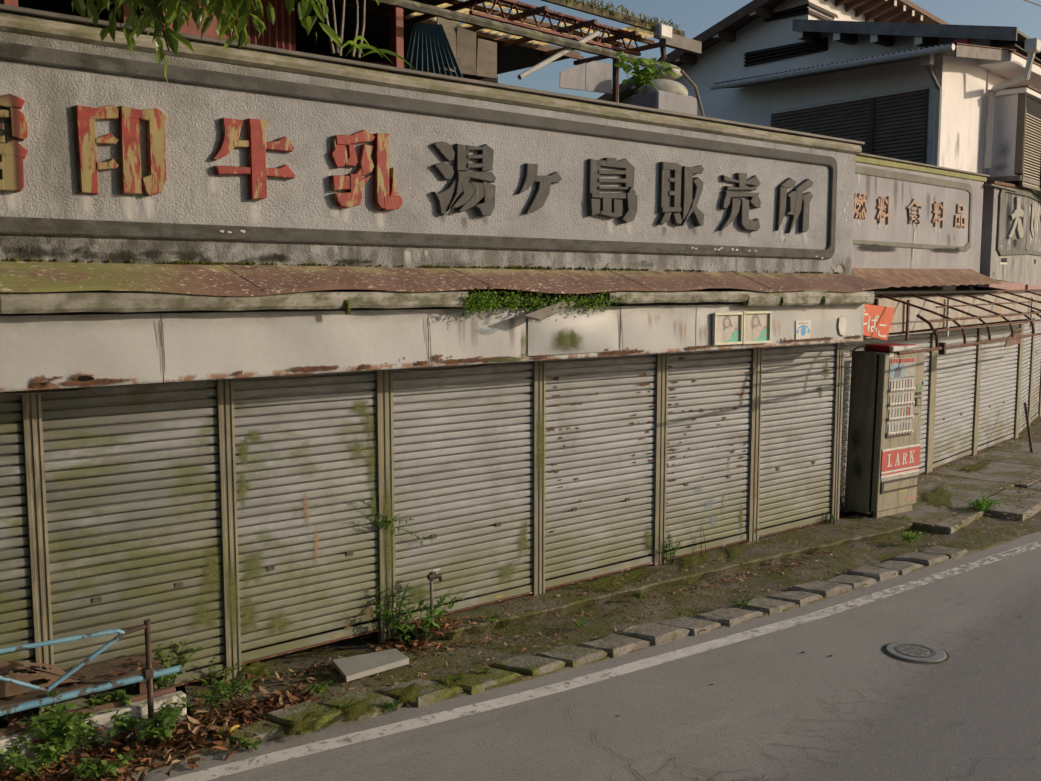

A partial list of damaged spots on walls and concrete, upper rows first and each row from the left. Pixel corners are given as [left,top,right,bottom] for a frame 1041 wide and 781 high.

leakage [124,196,153,219]
leakage [6,247,162,263]
leakage [240,254,286,265]
rust [32,376,130,387]
rust [667,371,751,482]